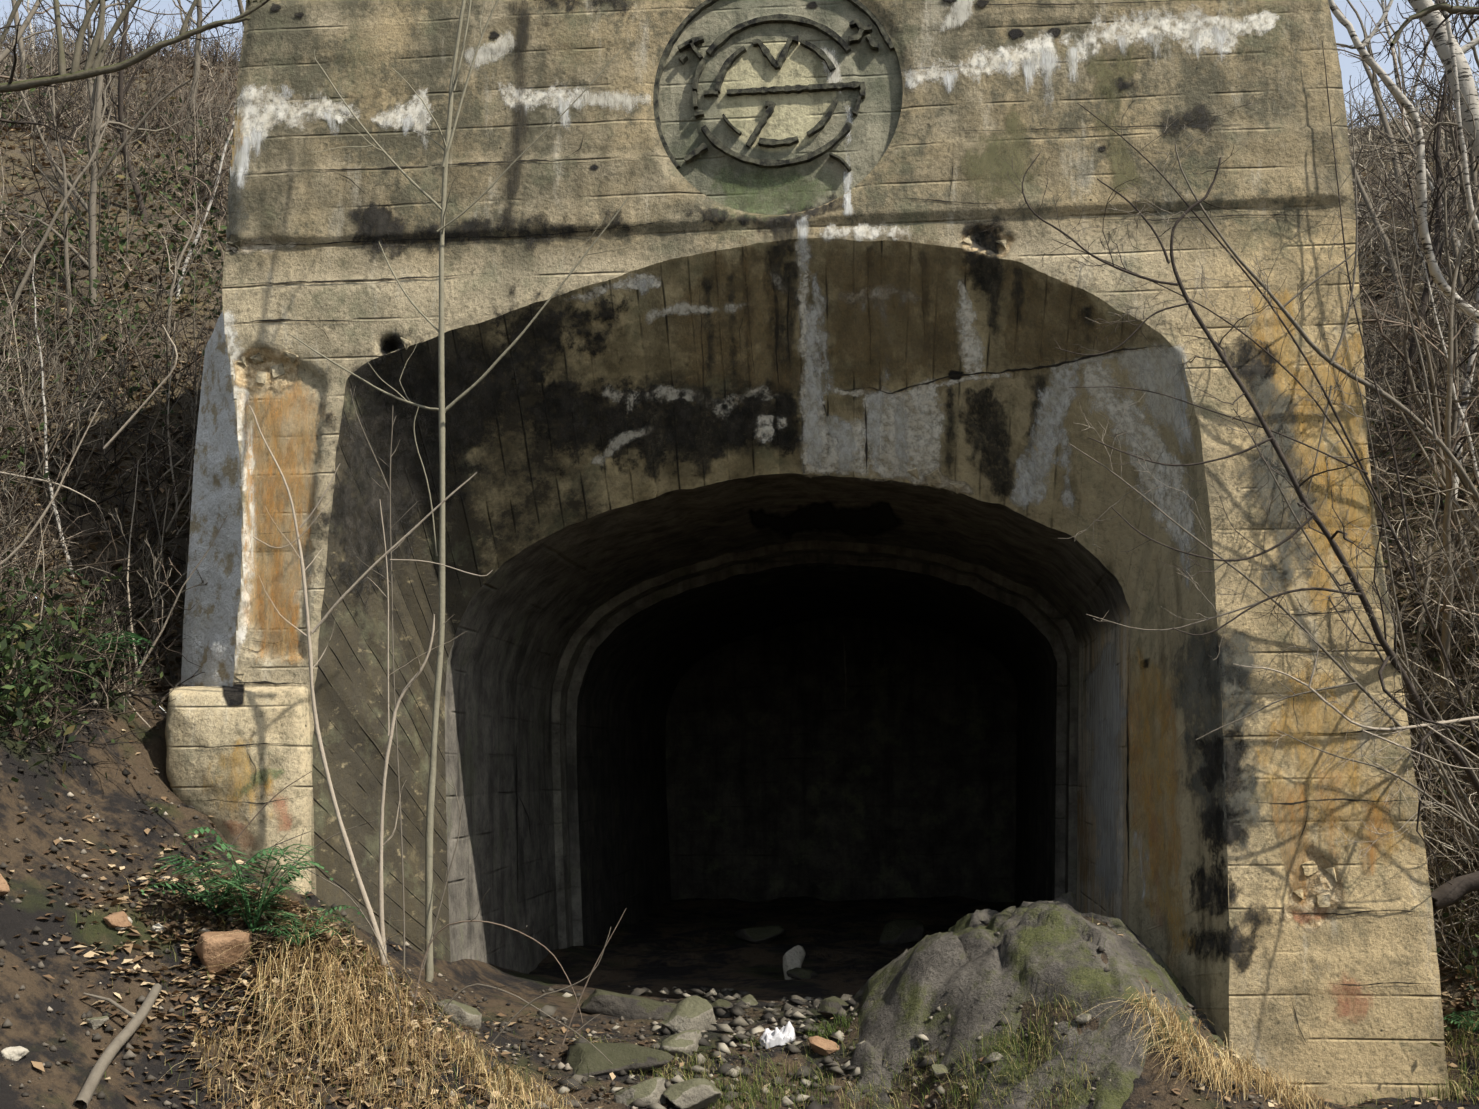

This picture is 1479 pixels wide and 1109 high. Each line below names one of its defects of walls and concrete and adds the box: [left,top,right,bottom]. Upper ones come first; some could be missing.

damp [226,85,431,239]
damp [349,0,648,259]
damp [905,8,1279,94]
damp [1161,102,1218,135]
damp [592,165,1195,584]
crack [739,248,1177,474]
corrosion [244,382,318,662]
spalling [222,673,245,706]
damp [1172,628,1272,972]
corrosion [1257,664,1403,901]